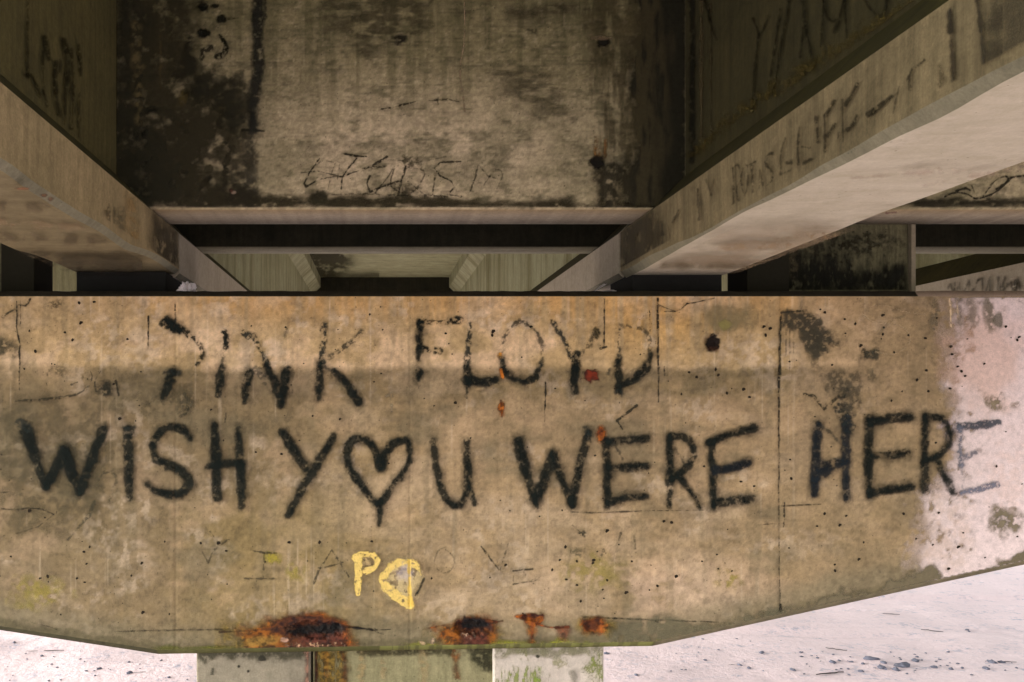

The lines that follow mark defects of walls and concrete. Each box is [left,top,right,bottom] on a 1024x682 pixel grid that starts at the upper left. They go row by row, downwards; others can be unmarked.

leakage [106,0,267,264]
leakage [929,298,1002,330]
leakage [985,398,1017,411]
leakage [989,505,1021,537]
leakage [998,551,1024,566]
leakage [744,564,942,621]
rust [515,613,613,644]
rust [219,611,373,682]
rust [420,615,503,680]